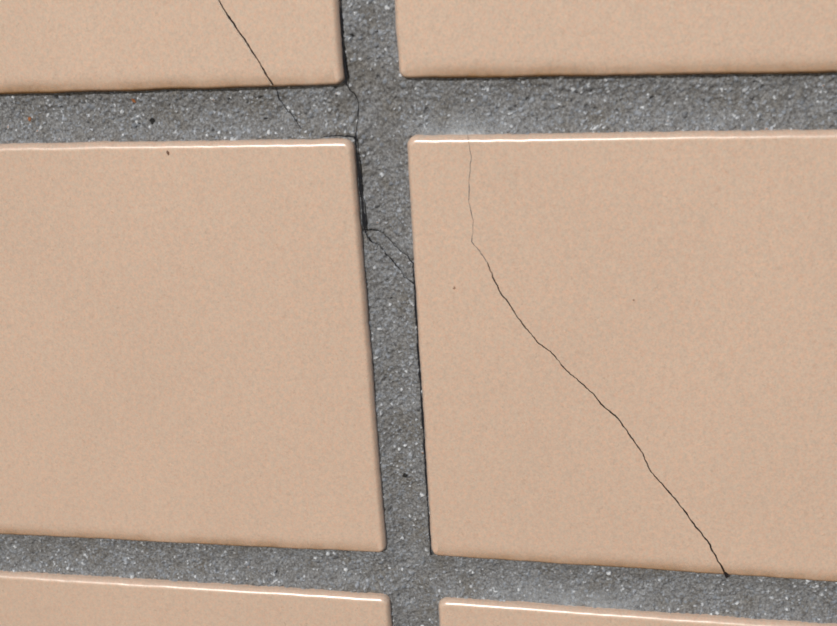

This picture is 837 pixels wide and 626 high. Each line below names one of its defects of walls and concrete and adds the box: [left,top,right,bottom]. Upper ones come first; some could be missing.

crack [218,0,301,129]
crack [323,84,359,138]
crack [364,229,414,284]
crack [471,239,728,578]